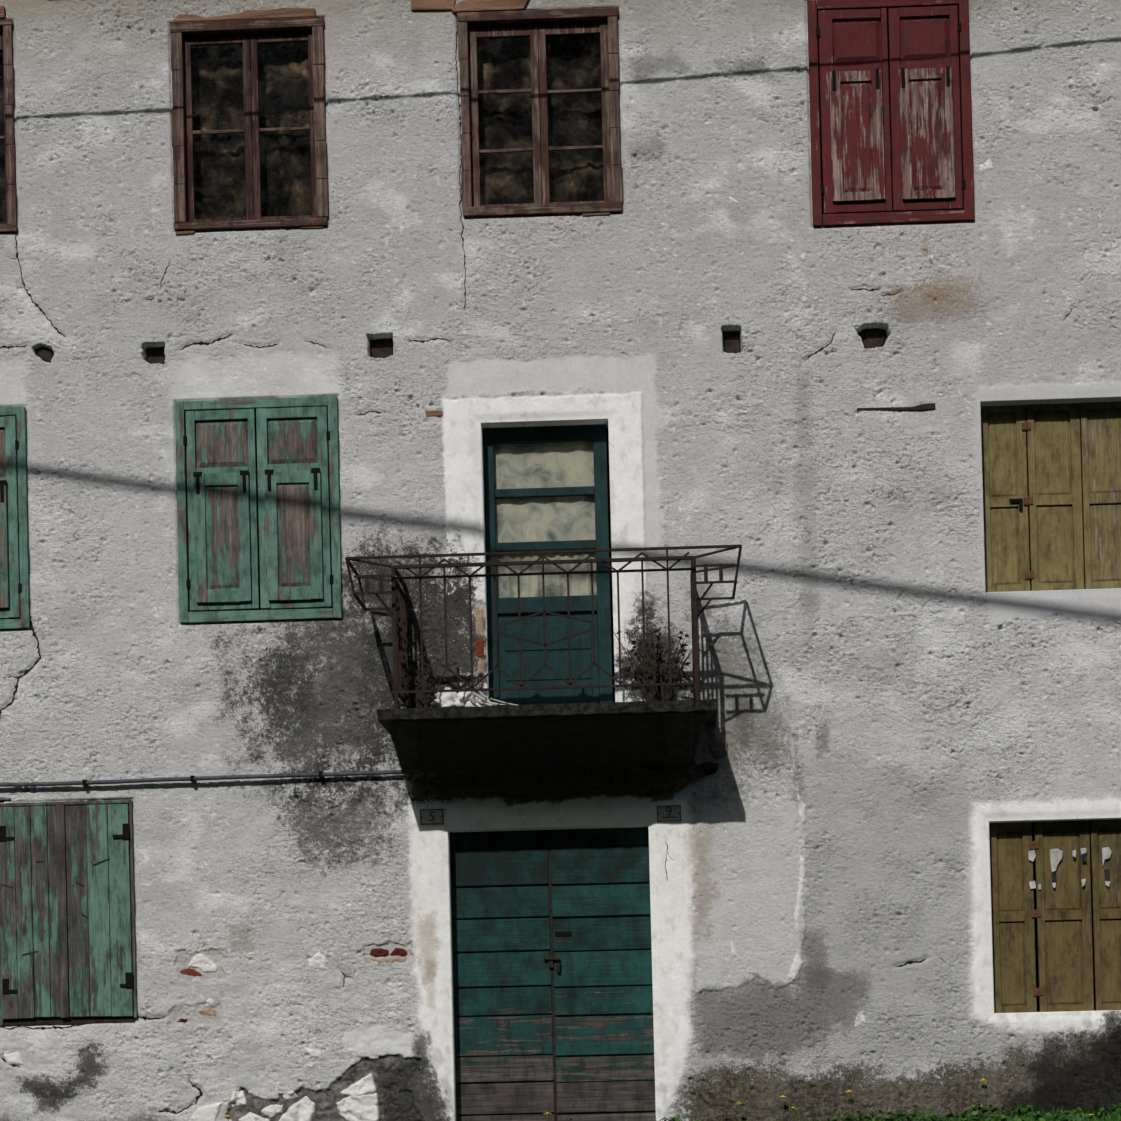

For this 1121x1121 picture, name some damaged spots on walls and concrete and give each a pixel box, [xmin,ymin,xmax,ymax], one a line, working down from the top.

crack [7,234,66,337]
crack [0,619,41,716]
water stain [211,519,706,872]
peeling [794,856,808,932]
peeling [787,951,803,981]
water stain [16,1043,109,1113]
peeling [189,1055,423,1121]
peeling [855,1011,866,1028]
water stain [673,968,1121,1121]